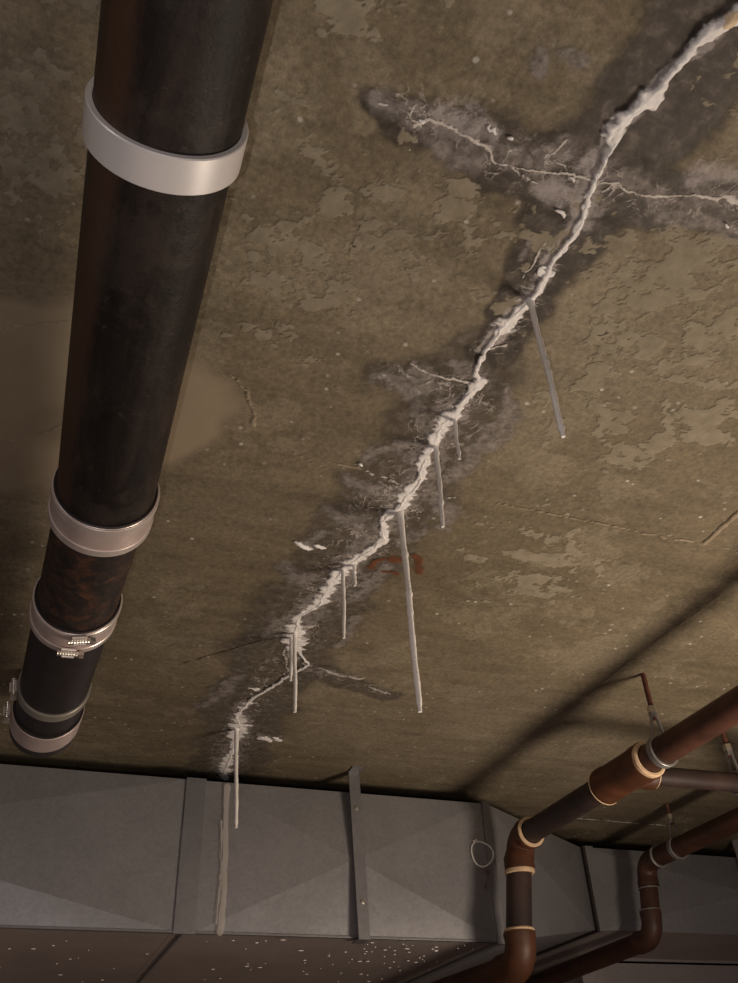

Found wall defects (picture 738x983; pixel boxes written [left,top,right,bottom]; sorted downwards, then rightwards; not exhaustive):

rust [367,554,424,576]
crack [185,4,738,781]
leakage [187,0,738,936]